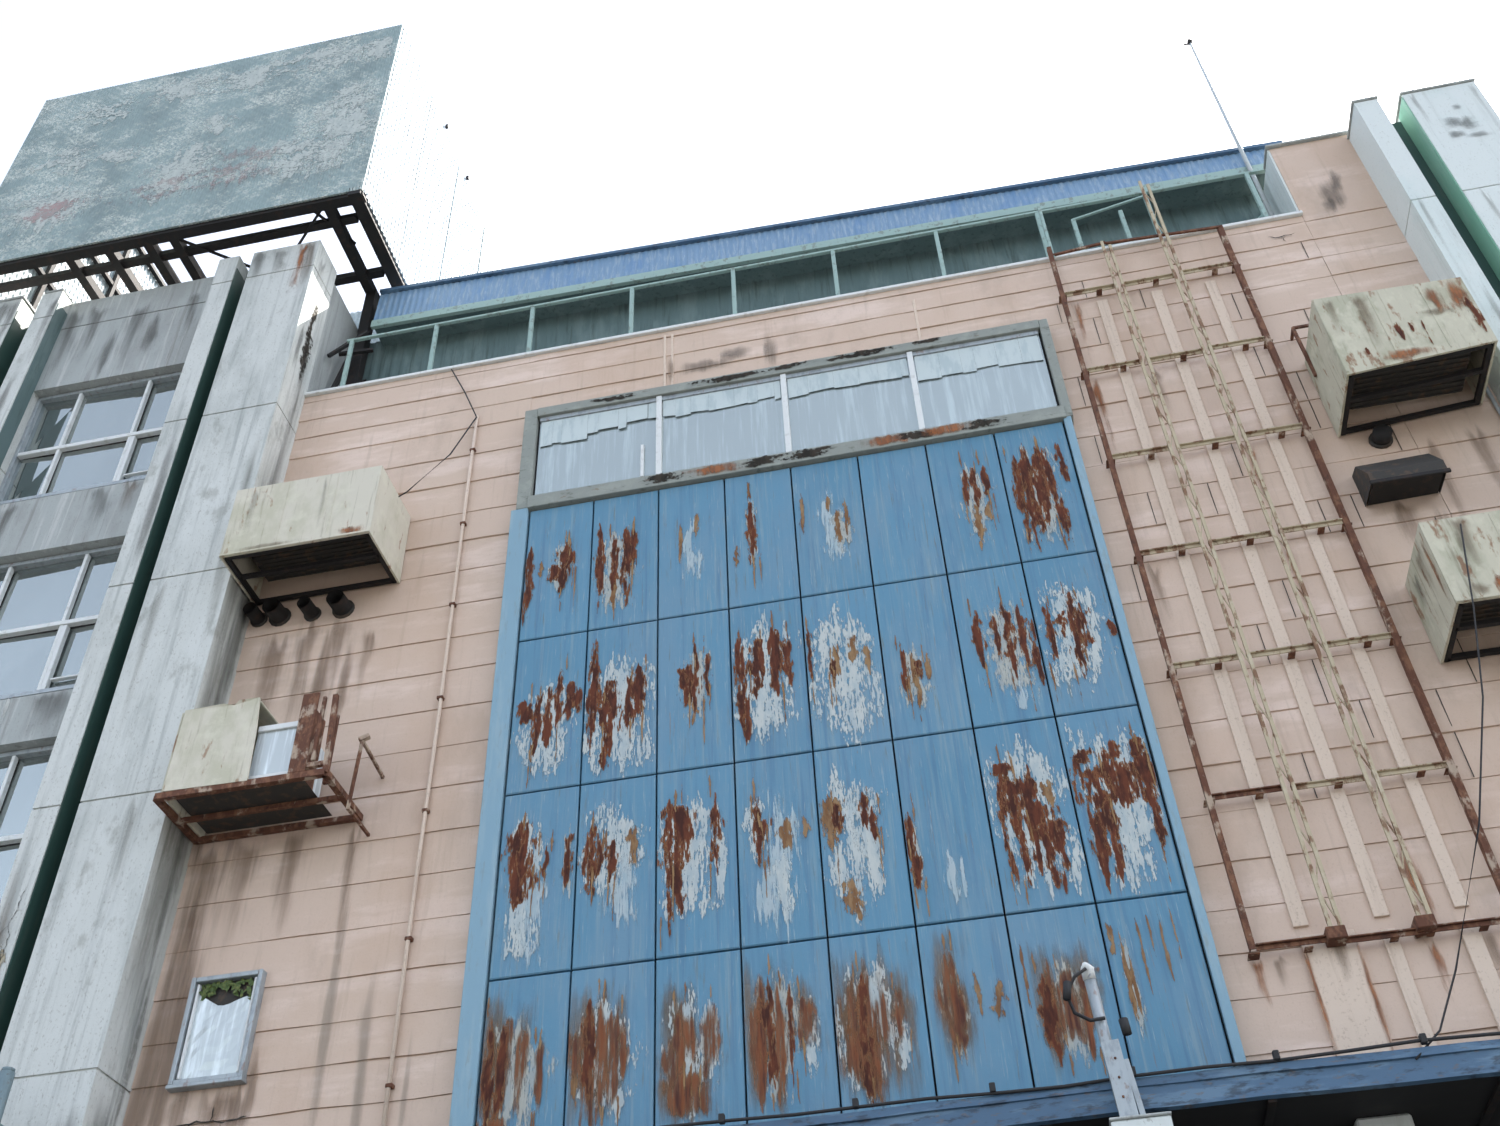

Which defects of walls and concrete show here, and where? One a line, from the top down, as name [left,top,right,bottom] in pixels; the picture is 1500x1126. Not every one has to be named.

corrosion [510,639,656,788]
corrosion [677,632,713,743]
corrosion [732,601,932,753]
corrosion [967,580,1119,711]
corrosion [498,763,930,964]
corrosion [947,851,967,904]
corrosion [983,721,1171,904]
corrosion [476,978,722,1126]
corrosion [744,951,914,1113]
corrosion [935,930,1009,1083]
corrosion [1019,945,1107,1076]
corrosion [1105,910,1182,1037]